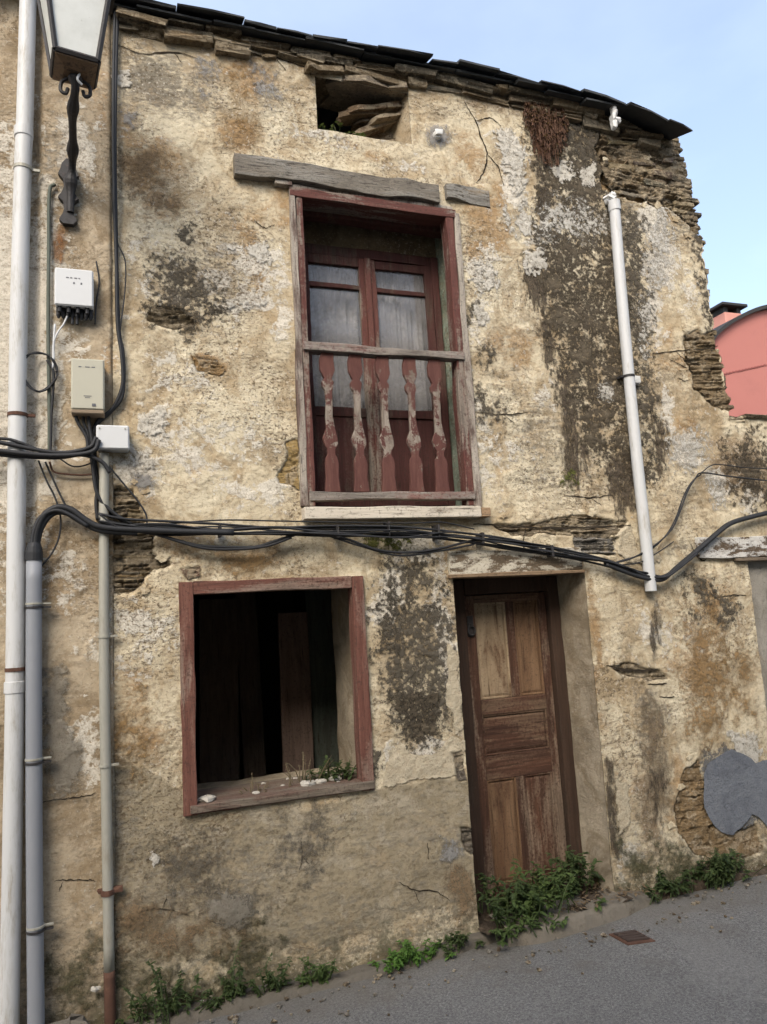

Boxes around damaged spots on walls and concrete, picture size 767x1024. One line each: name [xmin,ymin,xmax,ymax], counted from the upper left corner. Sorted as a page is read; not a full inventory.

crack [465,103,504,185]
spalling [147,300,194,330]
water stain [117,148,231,345]
water stain [515,110,670,522]
spalling [550,121,701,360]
water stain [688,234,713,333]
spalling [678,326,730,411]
spalling [112,443,170,595]
spalling [494,512,662,564]
water stain [366,539,463,755]
spalling [667,753,763,859]
crack [400,882,450,901]